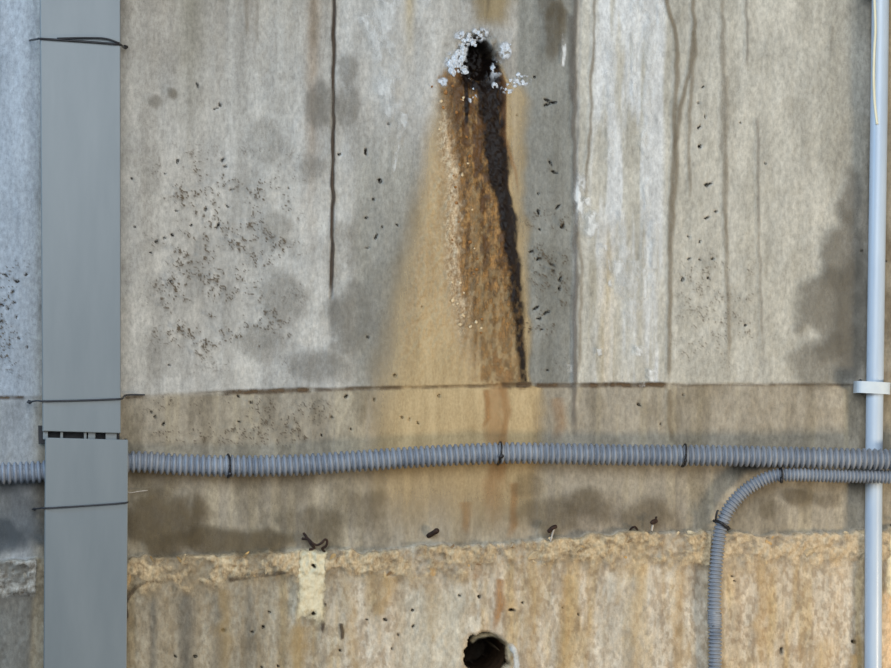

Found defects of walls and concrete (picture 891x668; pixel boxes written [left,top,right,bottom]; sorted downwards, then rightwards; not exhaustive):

crack [329,0,337,289]
rust [378,34,541,452]
rust [384,461,535,504]
rust [495,580,504,622]